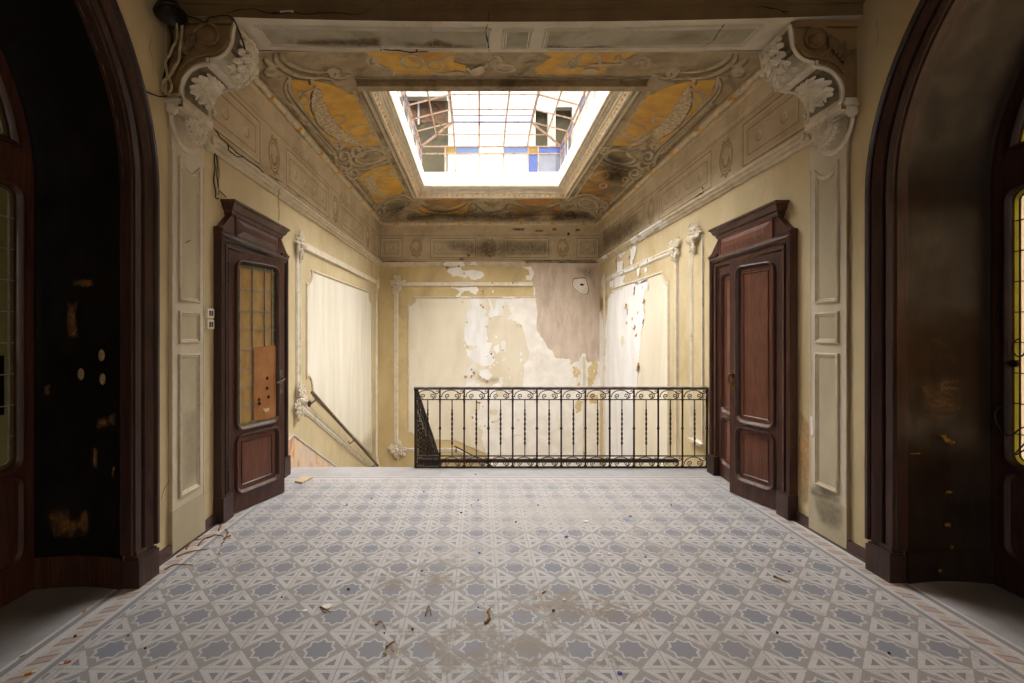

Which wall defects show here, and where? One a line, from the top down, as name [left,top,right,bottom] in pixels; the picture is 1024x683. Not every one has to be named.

peeling [443,220,668,466]